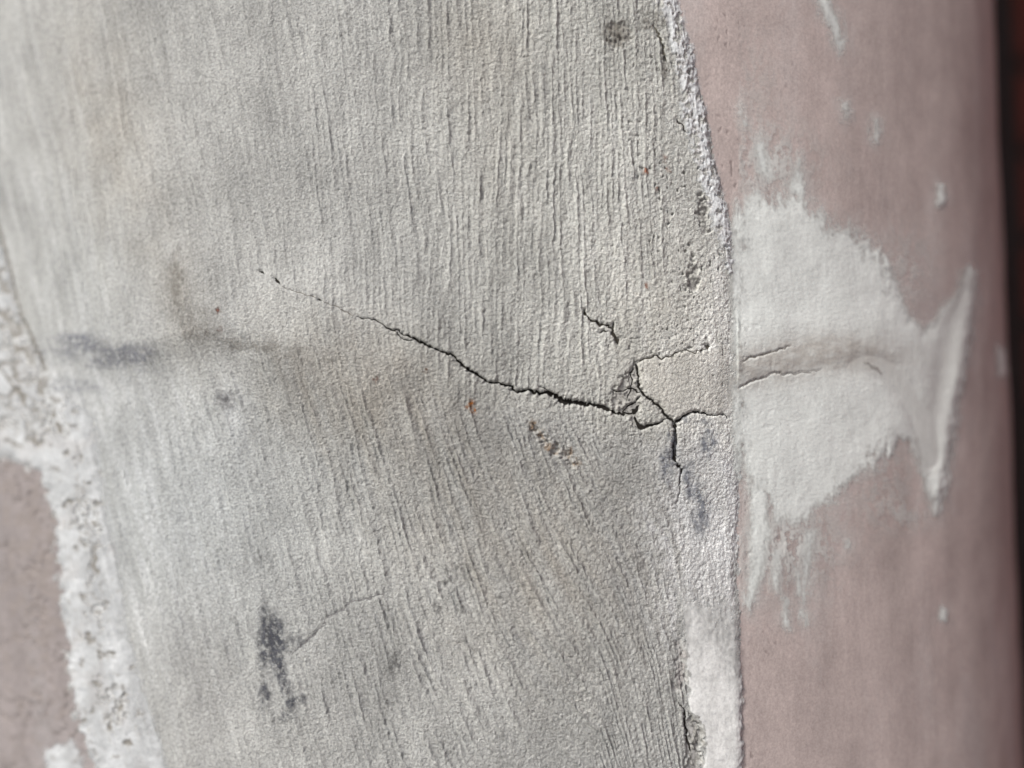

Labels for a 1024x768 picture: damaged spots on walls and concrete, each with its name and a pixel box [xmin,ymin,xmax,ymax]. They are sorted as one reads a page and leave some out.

peeling [0,258,165,768]
crack [259,271,728,502]